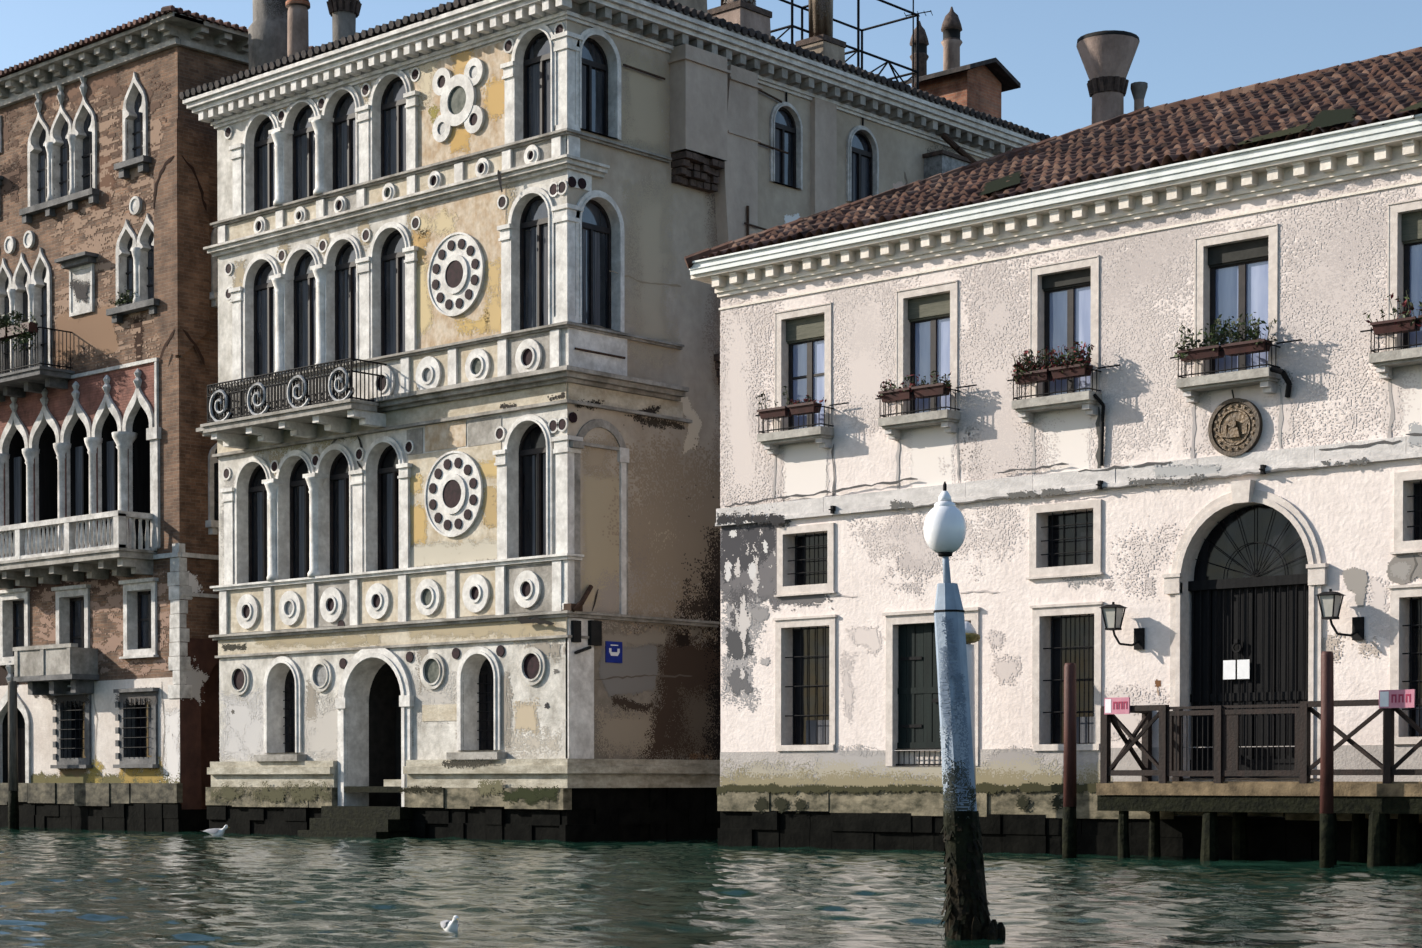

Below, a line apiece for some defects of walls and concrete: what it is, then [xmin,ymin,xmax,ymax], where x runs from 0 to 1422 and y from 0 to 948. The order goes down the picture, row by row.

water stain [614,49,718,371]
water stain [822,171,1422,490]
spalling [32,571,210,706]
water stain [581,287,835,760]
peeling [724,529,775,696]
water stain [984,629,1022,686]
water stain [1093,515,1181,601]
peeling [1342,567,1368,607]
water stain [1366,576,1393,639]
peeling [1386,553,1422,585]
water stain [1102,684,1170,745]
water stain [987,745,1044,780]